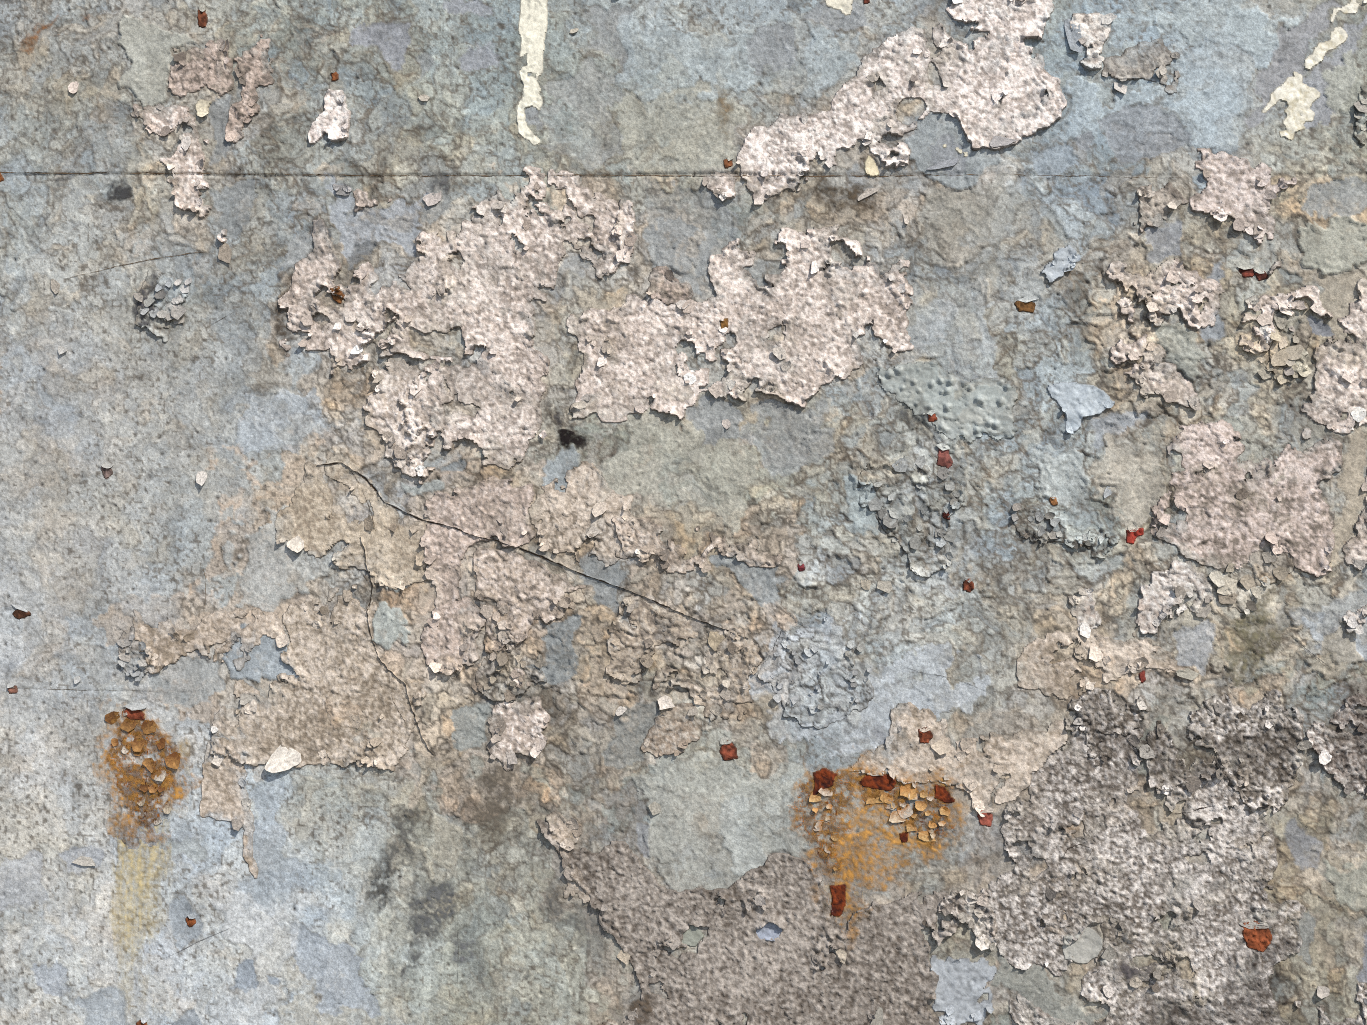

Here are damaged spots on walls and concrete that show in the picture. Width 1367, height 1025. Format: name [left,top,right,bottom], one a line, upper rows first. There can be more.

peeling [130,34,275,218]
peeling [702,0,1181,205]
peeling [1133,148,1297,245]
peeling [566,224,914,423]
peeling [117,166,782,879]
crack [320,461,749,754]
peeling [536,258,1367,1025]
rust [100,702,186,937]
rust [792,767,994,936]